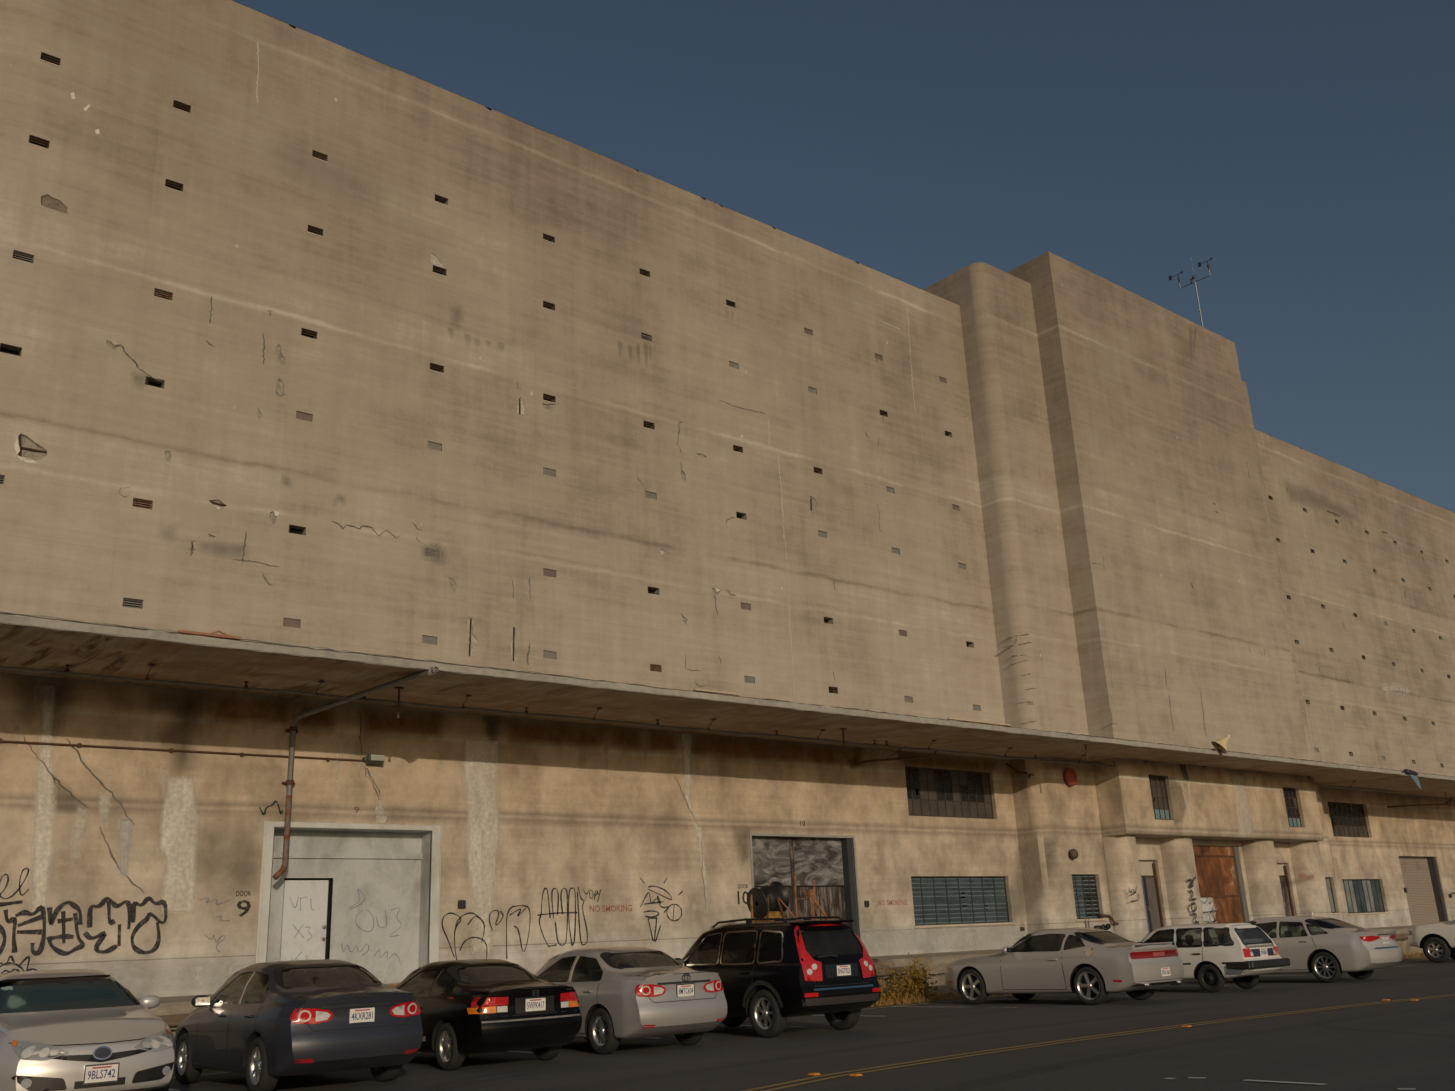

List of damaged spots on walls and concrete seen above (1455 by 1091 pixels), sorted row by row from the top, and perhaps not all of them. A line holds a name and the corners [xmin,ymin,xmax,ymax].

spalling [41,194,68,214]
crack [107,340,162,382]
spalling [15,434,47,463]
crack [332,521,421,542]
crack [24,736,144,893]